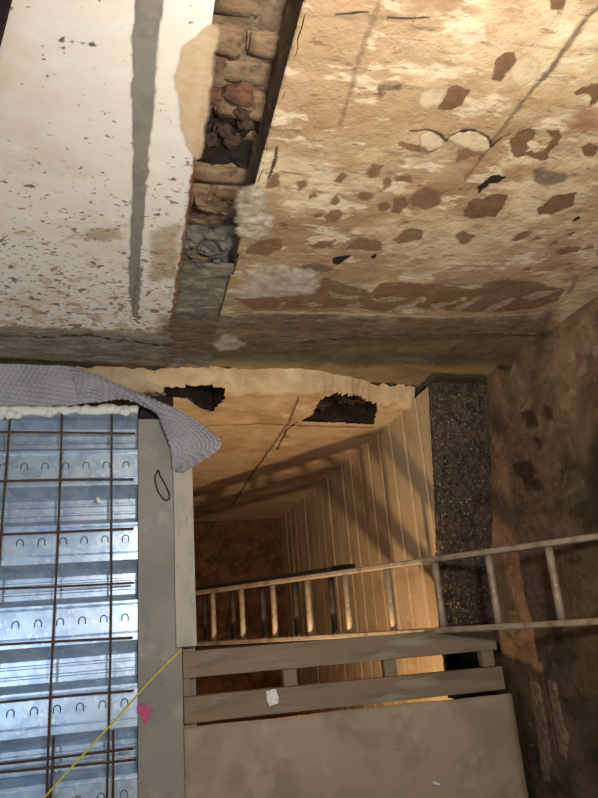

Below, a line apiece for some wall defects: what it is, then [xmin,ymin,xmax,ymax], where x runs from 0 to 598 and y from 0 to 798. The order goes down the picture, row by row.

crack [509,8,598,120]
flaking render [0,0,598,627]
crack [232,400,322,505]